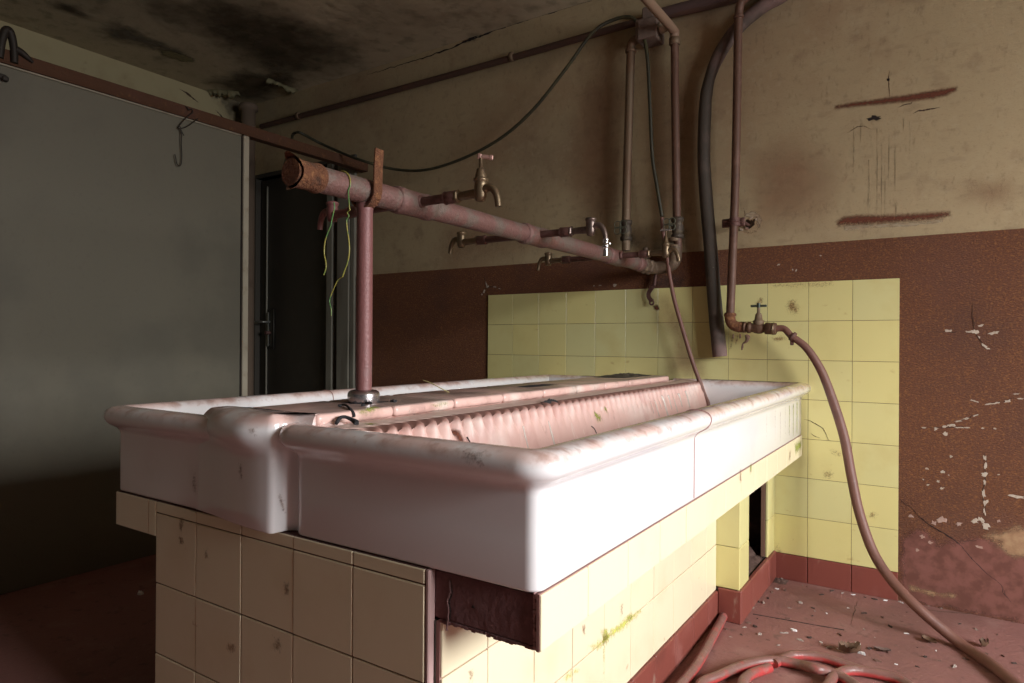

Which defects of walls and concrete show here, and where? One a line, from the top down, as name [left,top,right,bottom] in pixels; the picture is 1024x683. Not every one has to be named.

leakage [179,4,334,97]
peeling [935,320,1000,349]
peeling [922,393,1024,436]
crack [900,499,1020,609]
flaking render [900,453,1024,624]